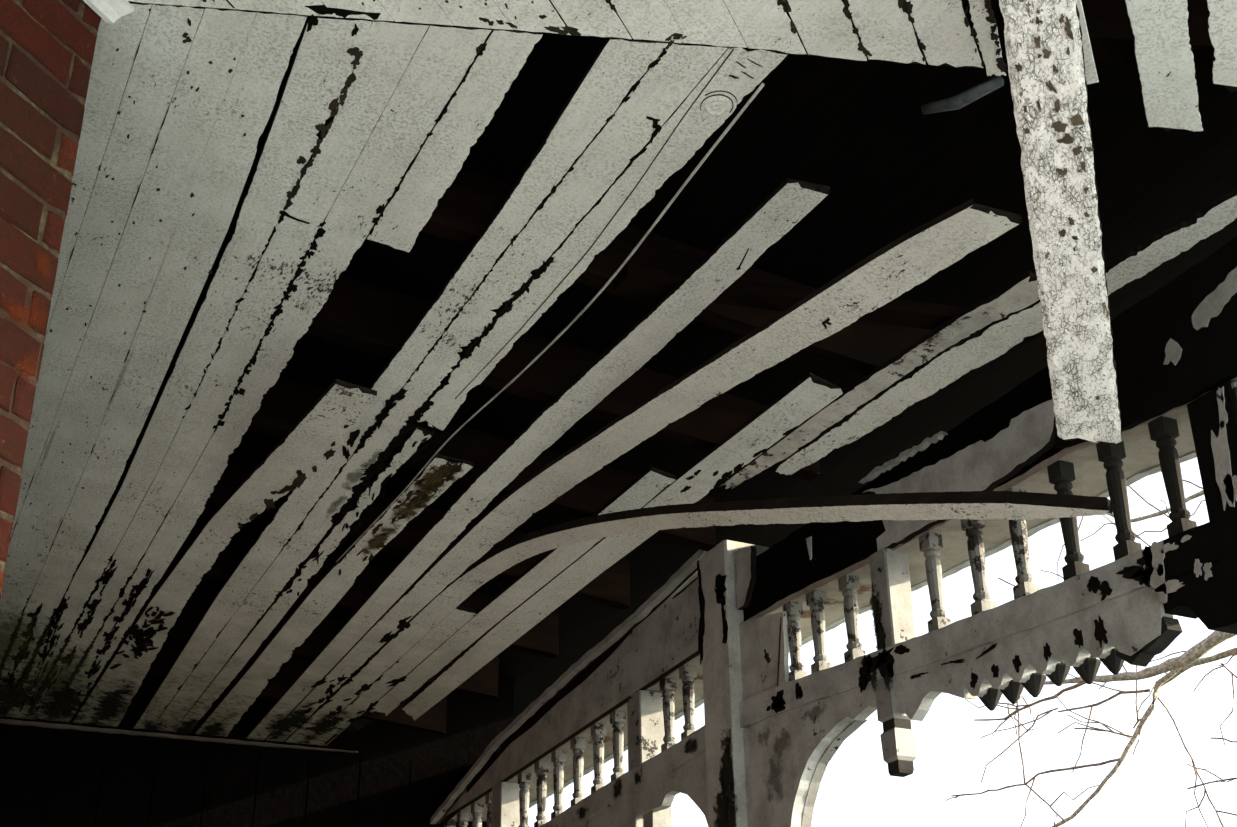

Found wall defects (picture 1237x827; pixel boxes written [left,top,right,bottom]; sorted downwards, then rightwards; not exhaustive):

peeling [283,47,363,210]
peeling [606,33,683,122]
peeling [898,0,926,62]
peeling [1023,10,1094,194]
peeling [464,256,554,359]
peeling [1192,267,1237,330]
peeling [238,257,500,527]
peeling [282,401,463,596]
peeling [1211,386,1237,511]
peeling [697,560,728,665]
peeling [1073,535,1213,648]
damp [0,613,135,727]